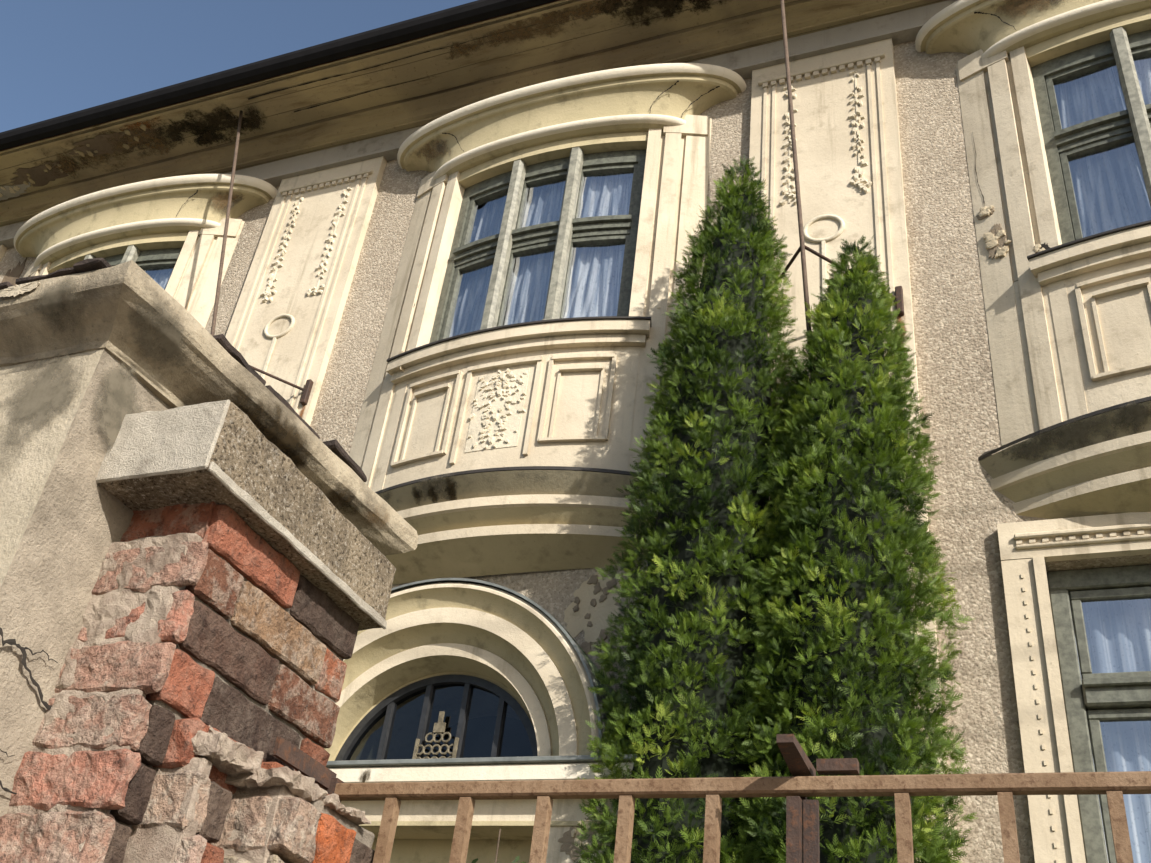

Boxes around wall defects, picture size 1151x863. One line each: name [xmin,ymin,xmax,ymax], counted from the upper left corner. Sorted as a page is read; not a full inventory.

damp [449,0,723,59]
damp [42,107,264,174]
flaking render [976,206,1012,259]
damp [34,278,84,328]
damp [130,303,185,363]
damp [9,354,74,443]
damp [96,365,141,447]
damp [235,388,317,467]
damp [328,485,386,523]
crack [0,628,58,711]
crack [0,749,17,794]